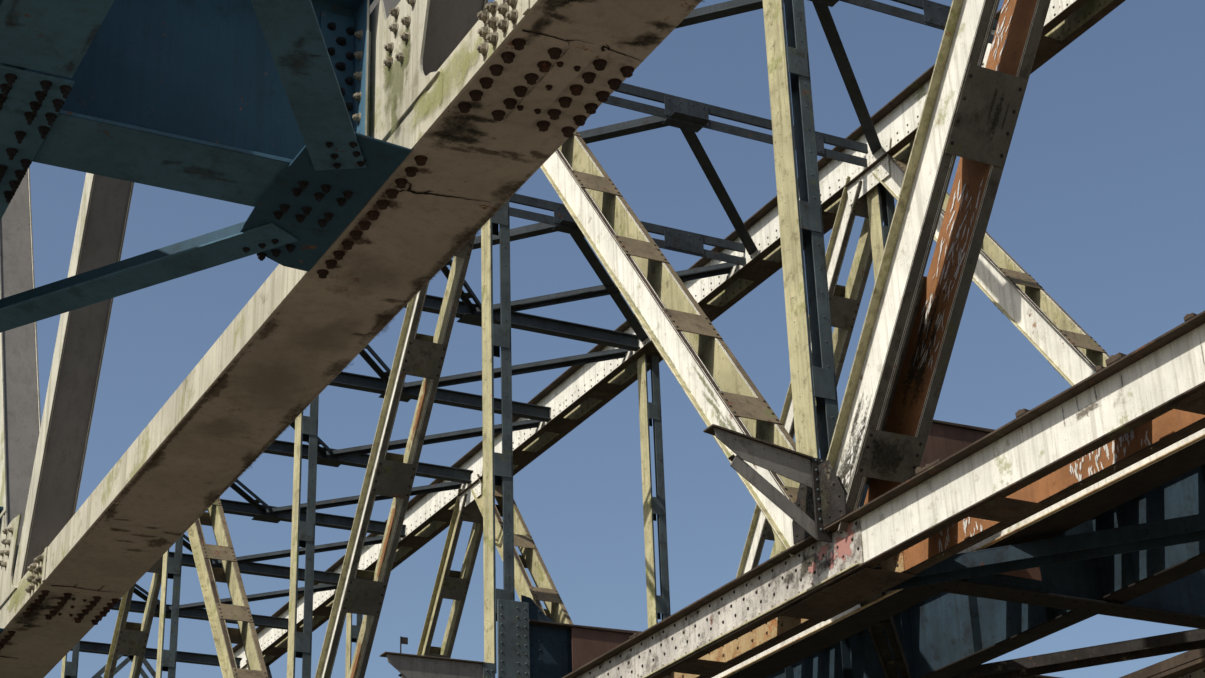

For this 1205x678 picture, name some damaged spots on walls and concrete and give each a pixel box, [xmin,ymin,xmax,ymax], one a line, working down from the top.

leakage [527,0,593,41]
leakage [623,22,673,47]
peeling [991,0,1012,71]
peeling [913,180,983,369]
leakage [86,320,277,552]
leakage [205,403,309,503]
peeling [1070,430,1152,481]